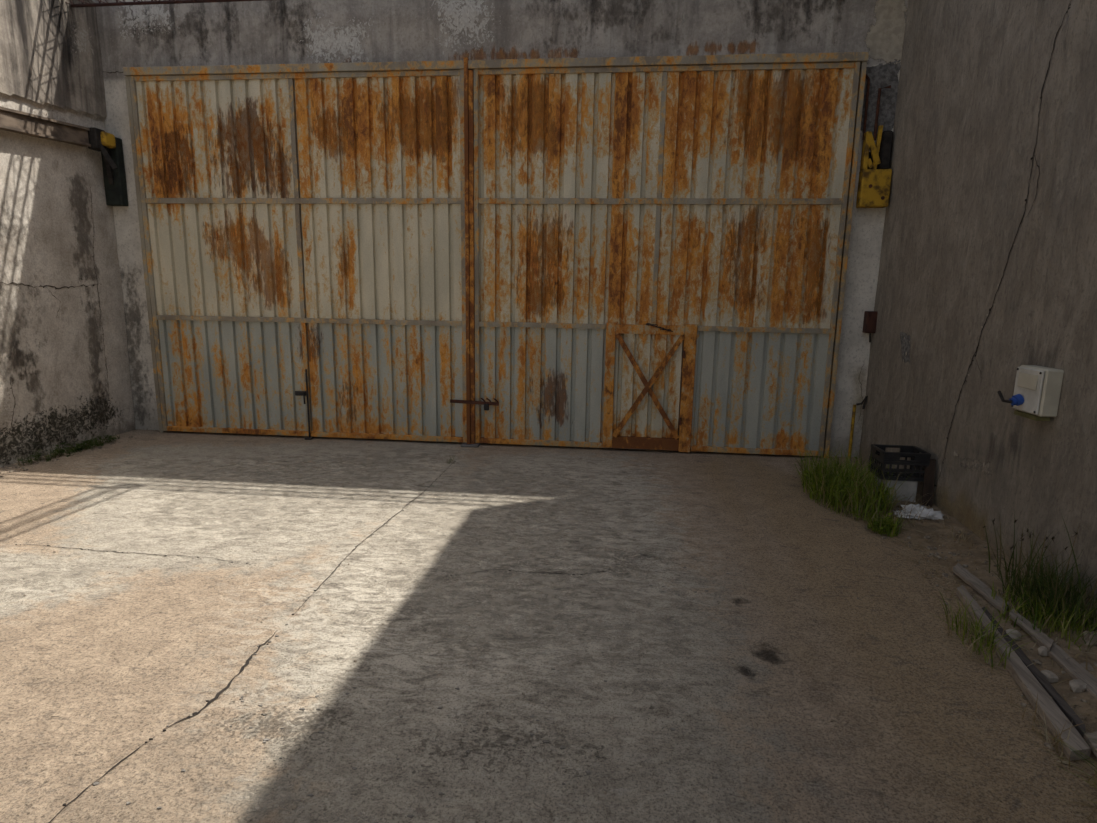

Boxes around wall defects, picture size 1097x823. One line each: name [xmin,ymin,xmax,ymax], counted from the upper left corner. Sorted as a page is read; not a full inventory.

leakage [17,0,32,41]
crack [1,154,110,402]
leakage [70,176,98,280]
corrosion [155,125,196,198]
corrosion [203,98,291,307]
corrosion [376,77,460,162]
corrosion [725,208,766,312]
corrosion [734,69,817,161]
leakage [0,292,42,410]
leakage [88,292,108,423]
corrosion [530,373,568,428]
crack [48,460,456,823]